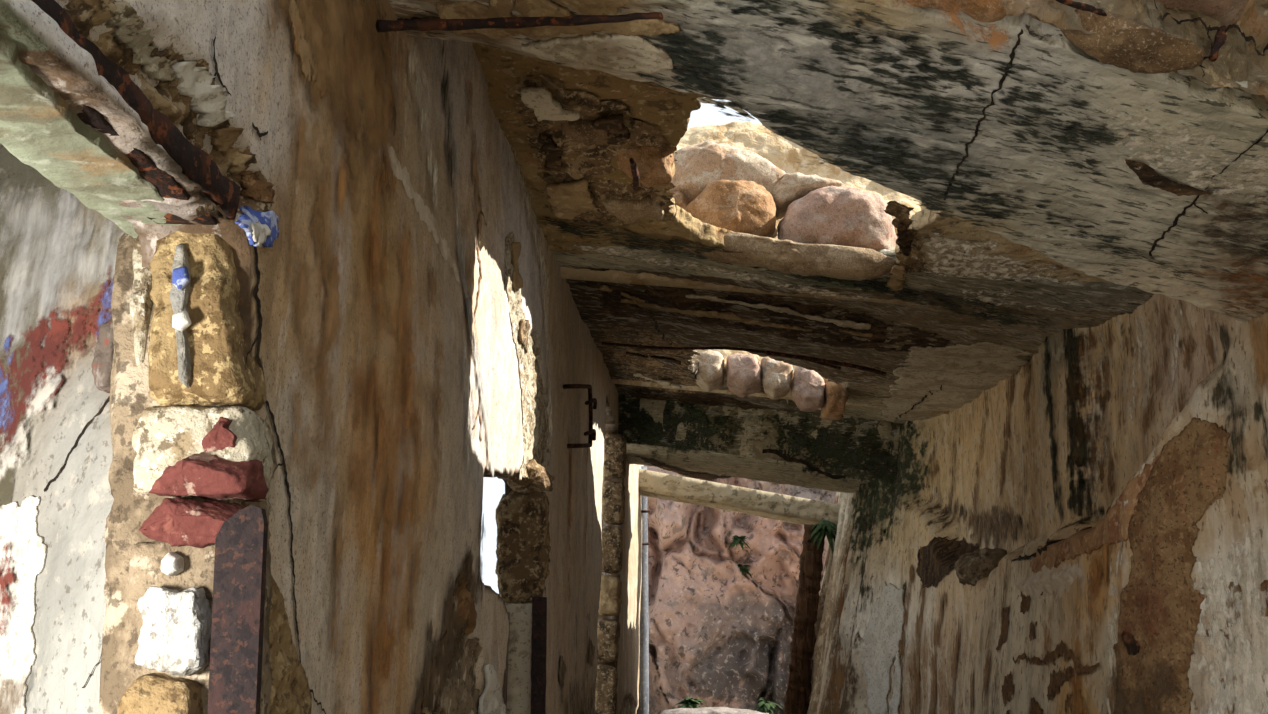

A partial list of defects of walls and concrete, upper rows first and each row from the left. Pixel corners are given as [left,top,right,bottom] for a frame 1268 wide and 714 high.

flaking render [61,0,279,247]
damp [409,42,457,211]
corrosion [376,12,663,33]
corrosion [940,0,1008,49]
crack [944,29,1023,200]
crack [1149,129,1268,256]
corrosion [1209,25,1227,62]
peeling [0,269,114,479]
damp [515,0,1268,714]
peeling [0,496,47,714]
crack [245,247,326,714]
flaking render [1029,417,1242,714]